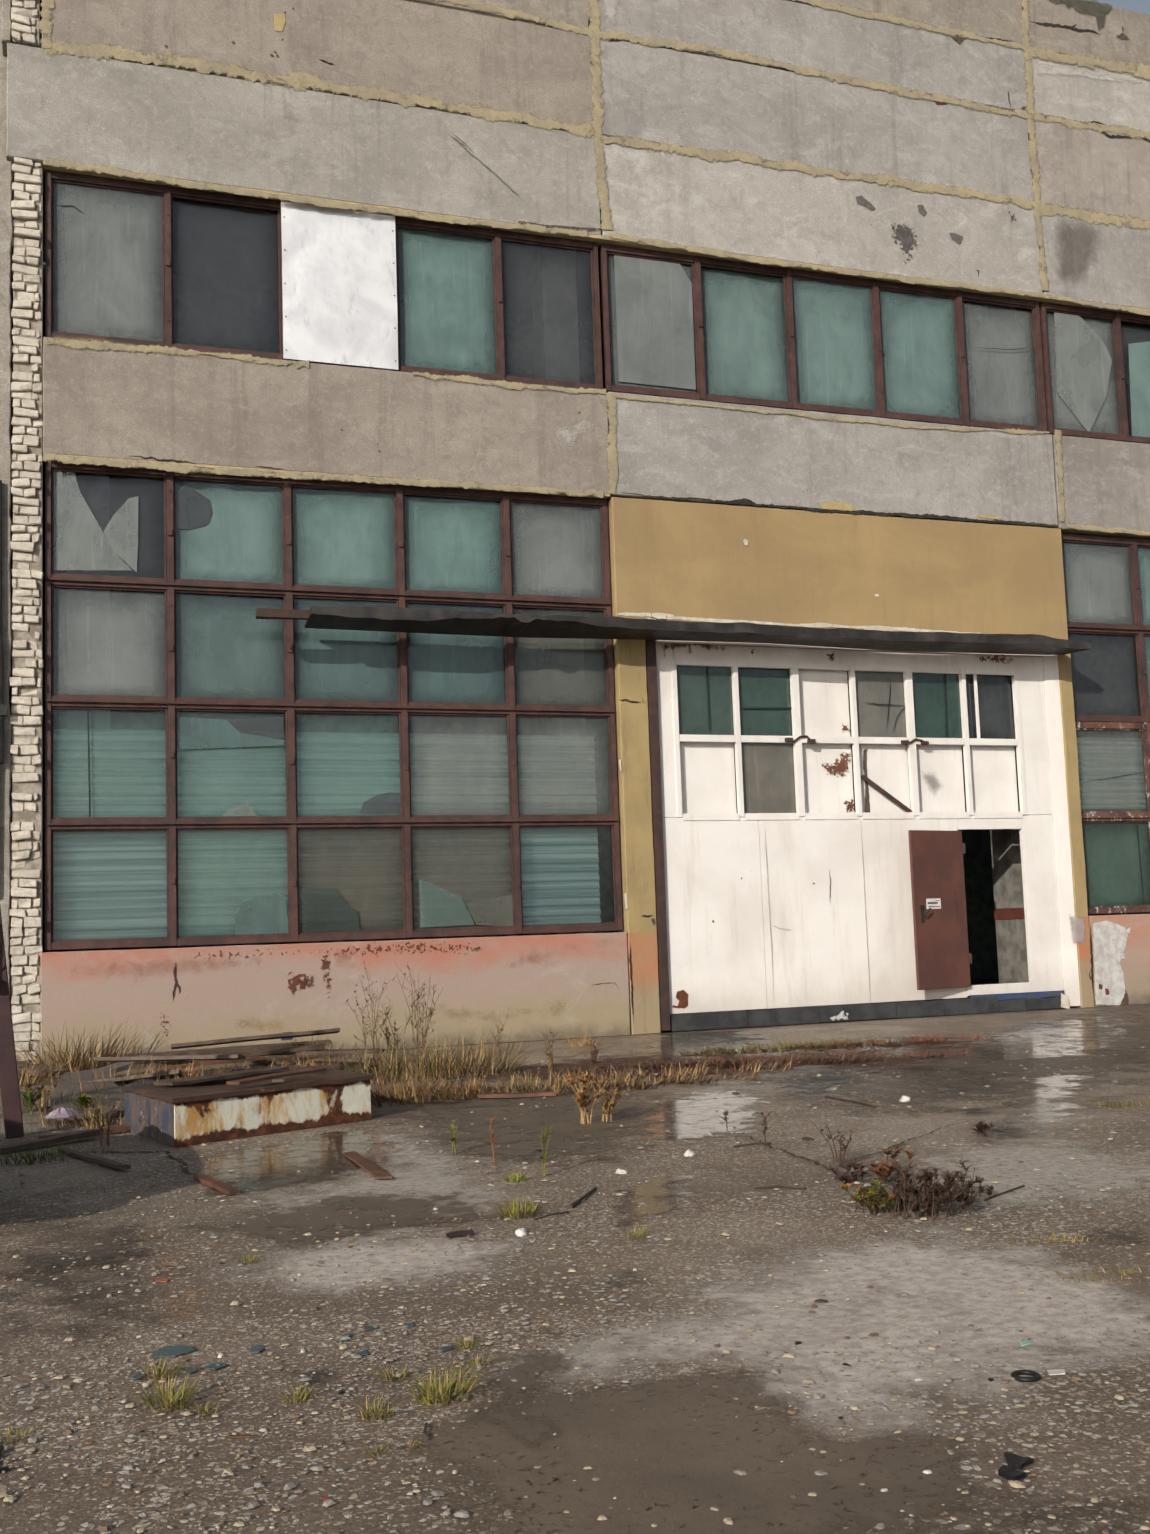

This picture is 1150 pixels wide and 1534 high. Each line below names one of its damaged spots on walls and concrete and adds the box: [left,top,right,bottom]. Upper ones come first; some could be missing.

spalling [856,195,876,211]
spalling [892,205,940,263]